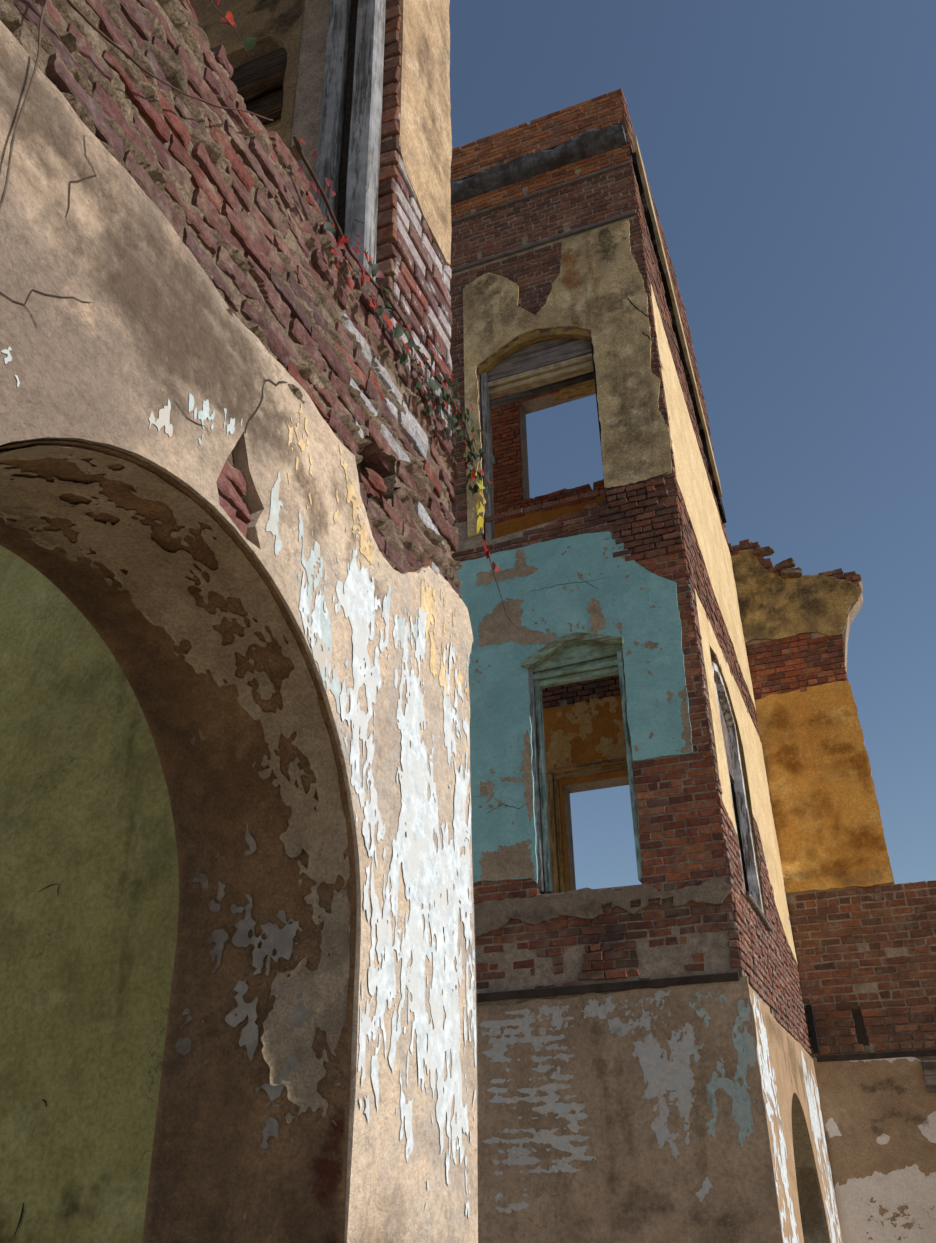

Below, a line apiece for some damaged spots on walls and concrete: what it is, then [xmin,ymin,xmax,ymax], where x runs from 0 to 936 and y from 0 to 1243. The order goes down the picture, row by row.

crack [66,136,96,231]
crack [0,289,91,328]
peeling [189,393,242,445]
crack [245,379,287,433]
peeling [0,399,799,1243]
peeling [799,1051,936,1243]